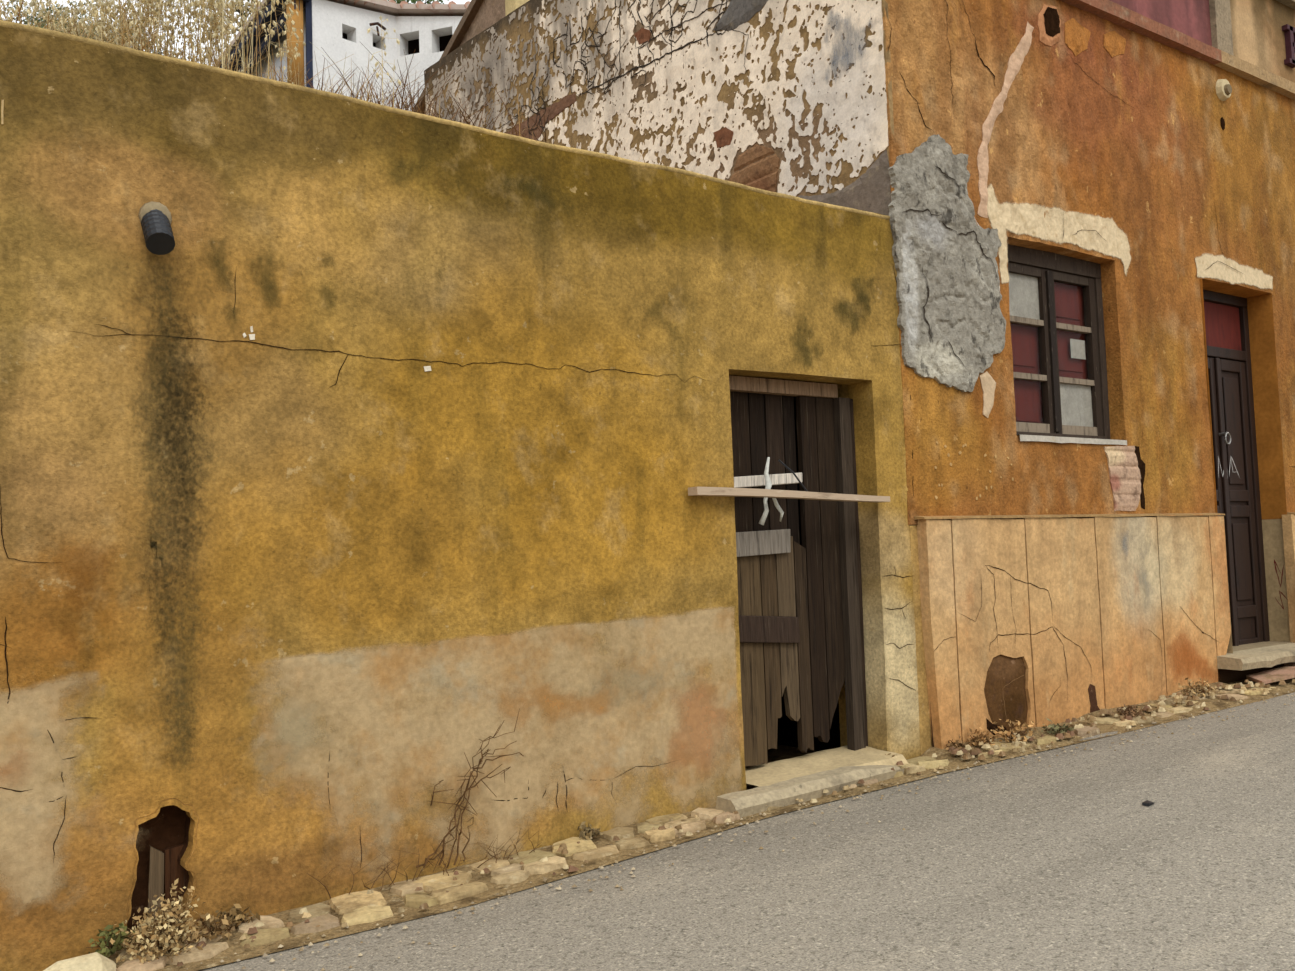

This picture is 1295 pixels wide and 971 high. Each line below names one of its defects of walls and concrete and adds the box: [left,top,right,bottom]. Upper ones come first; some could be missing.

crack [495,0,749,141]
spalling [1037,4,1126,57]
peeling [425,0,1006,418]
crack [73,324,723,388]
crack [0,617,11,704]
crack [886,565,1092,697]
spalling [984,655,1028,735]
crack [0,717,93,863]
spalling [126,798,199,933]